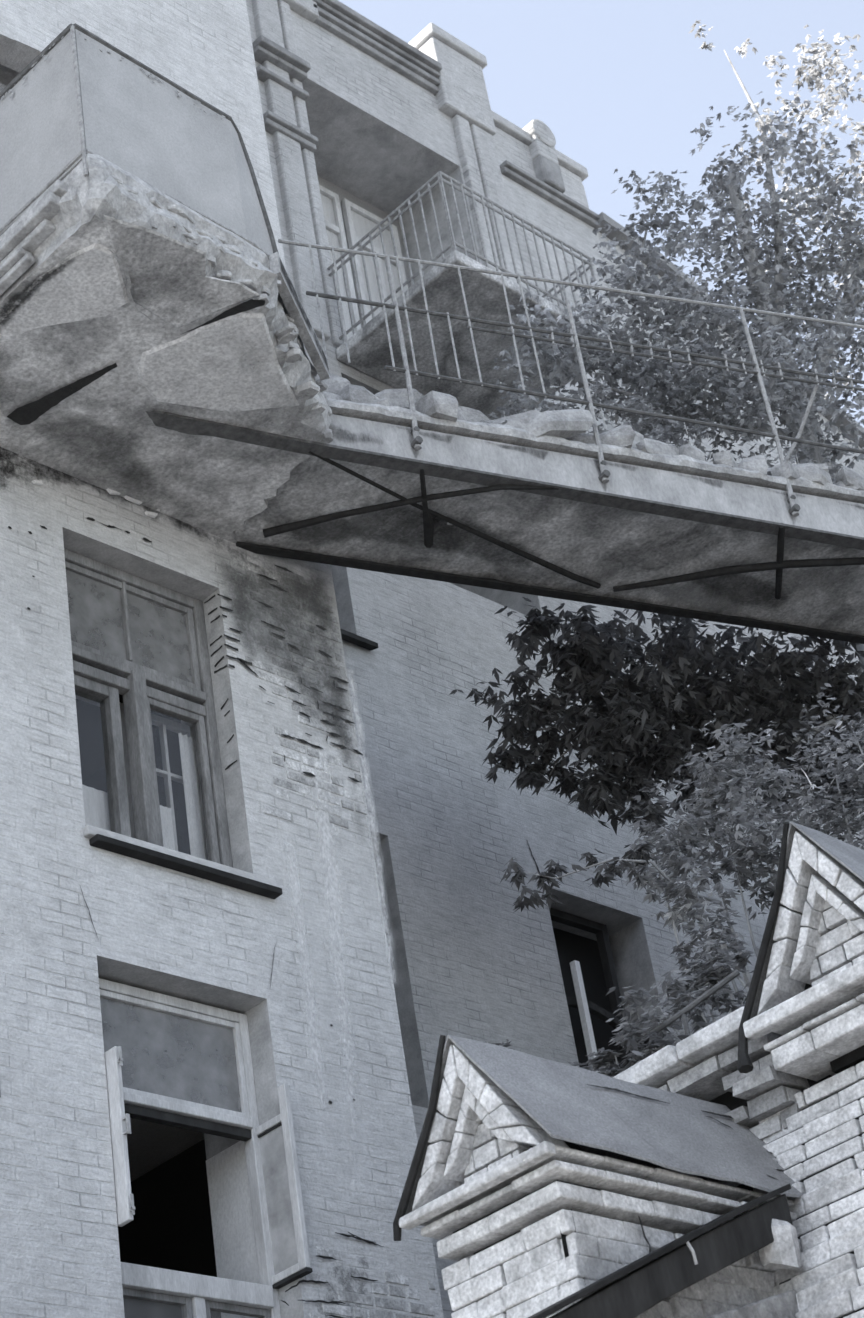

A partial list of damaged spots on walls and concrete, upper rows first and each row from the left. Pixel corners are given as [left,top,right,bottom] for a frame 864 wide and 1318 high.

peeling [0,175,333,443]
leakage [0,447,126,501]
leakage [144,506,218,541]
leakage [227,569,361,734]